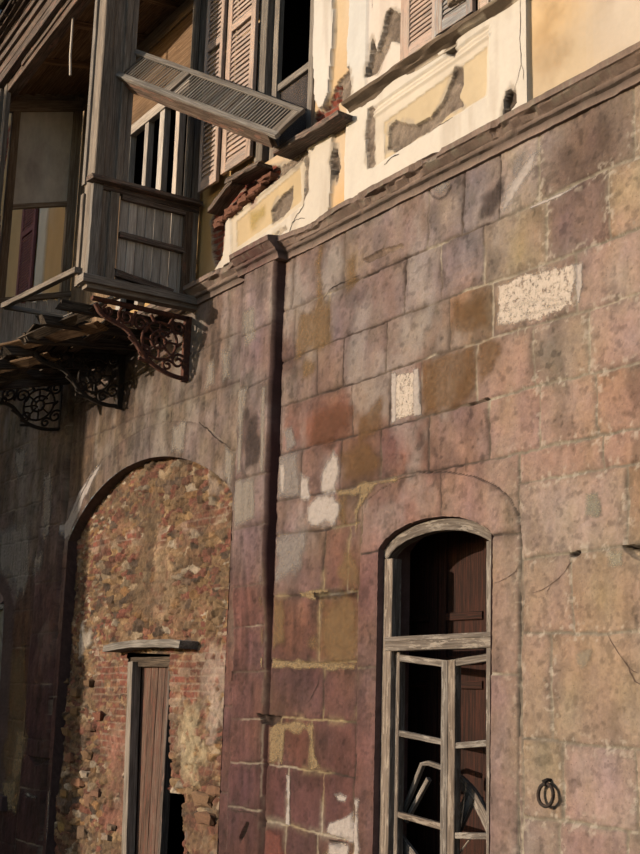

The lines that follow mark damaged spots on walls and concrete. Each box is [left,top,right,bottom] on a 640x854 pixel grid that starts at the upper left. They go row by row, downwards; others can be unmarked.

flaking render [364,7,401,78]
flaking render [315,66,352,123]
flaking render [388,51,464,153]
flaking render [502,88,517,115]
flaking render [329,148,341,183]
flaking render [364,105,376,170]
flaking render [211,150,310,266]
spalling [622,544,640,562]